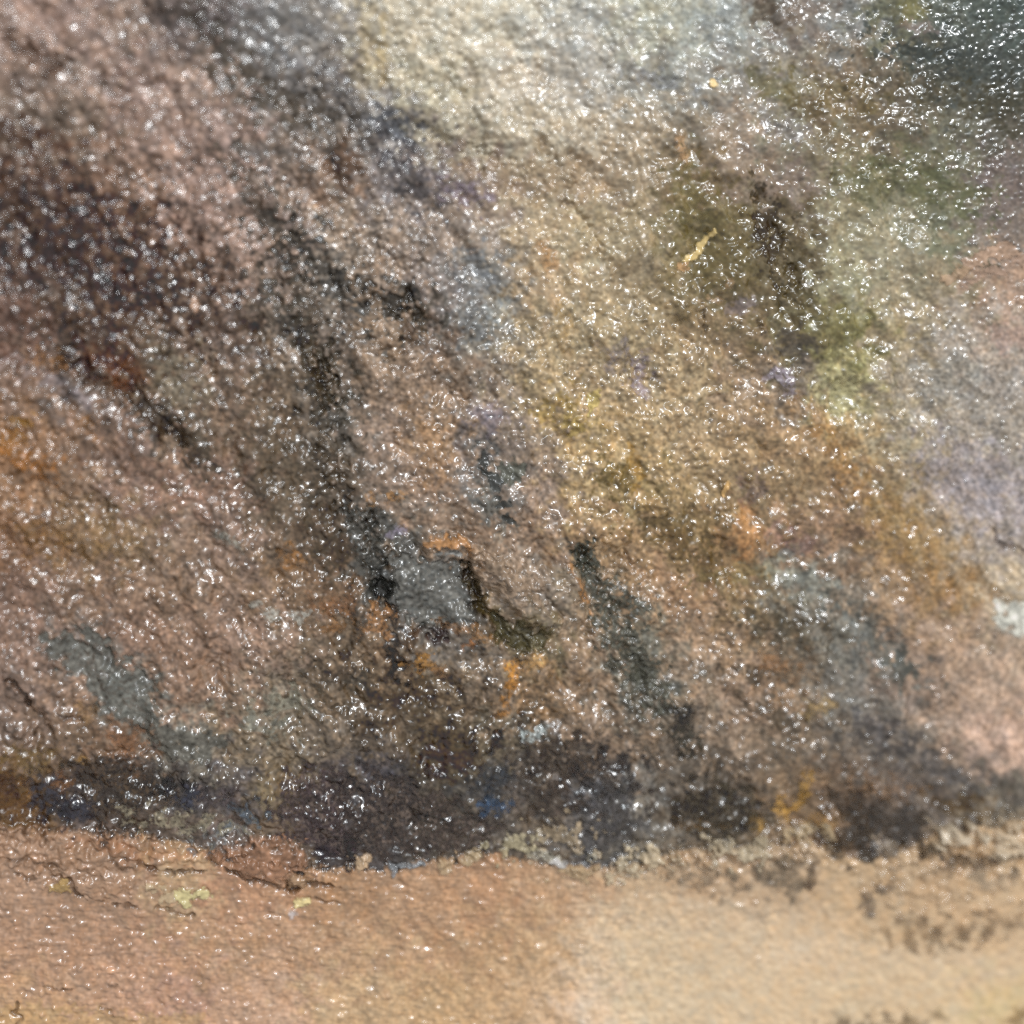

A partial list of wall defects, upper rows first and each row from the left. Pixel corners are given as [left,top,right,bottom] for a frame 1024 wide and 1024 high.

damp [762,367,795,395]
damp [249,600,313,625]
damp [27,725,684,886]
damp [670,762,773,874]
damp [784,786,1024,872]